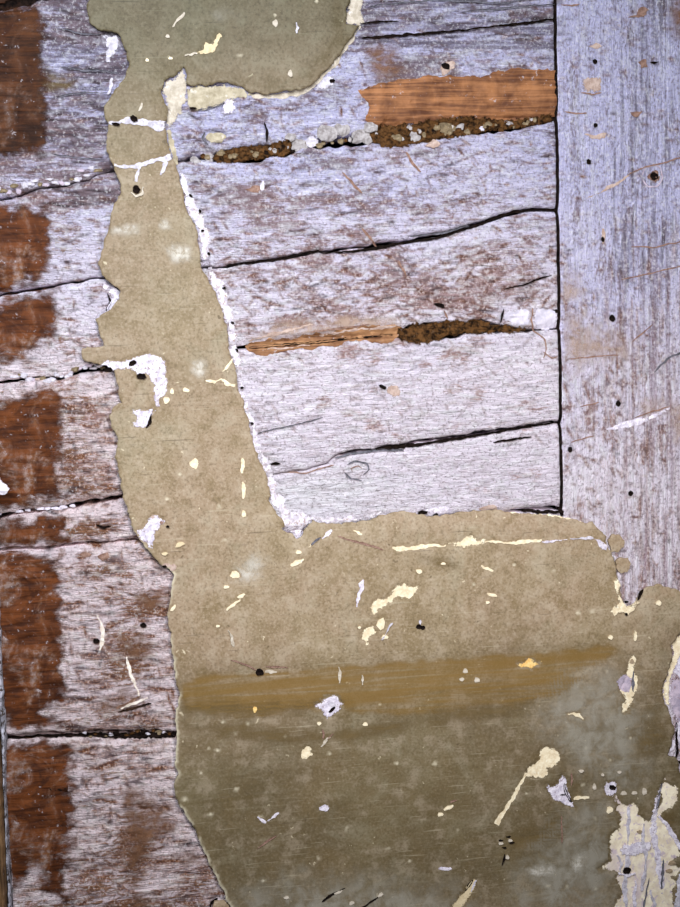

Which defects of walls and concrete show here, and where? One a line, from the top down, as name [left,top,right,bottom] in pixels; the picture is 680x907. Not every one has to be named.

peeling [0,0,50,157]
peeling [162,0,365,126]
crack [362,0,555,39]
peeling [0,197,61,364]
crack [226,208,554,266]
spalling [102,353,189,428]
crack [258,417,323,434]
crack [269,422,557,474]
peeling [0,389,70,730]
crack [8,731,175,739]
peeling [6,739,78,903]
flaking render [494,747,680,907]